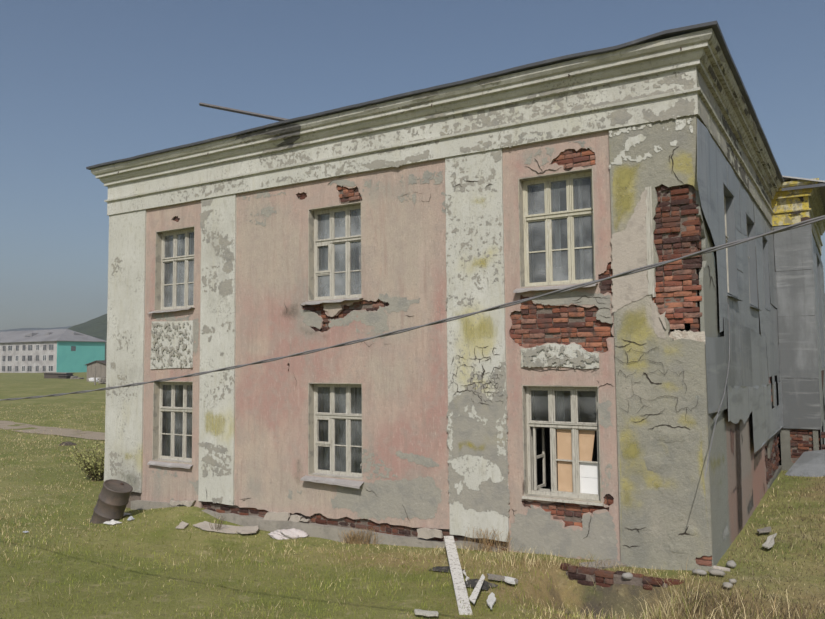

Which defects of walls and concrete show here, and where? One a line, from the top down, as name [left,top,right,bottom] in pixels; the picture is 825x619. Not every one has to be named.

peeling [235,46,750,309]
peeling [749,137,779,221]
peeling [168,179,248,297]
flaking render [652,184,705,342]
peeling [149,312,234,368]
crack [449,346,503,405]
flaking render [510,262,614,370]
crack [523,340,698,430]
peeling [189,442,232,495]
peeling [331,361,618,561]
flaking render [765,429,825,484]